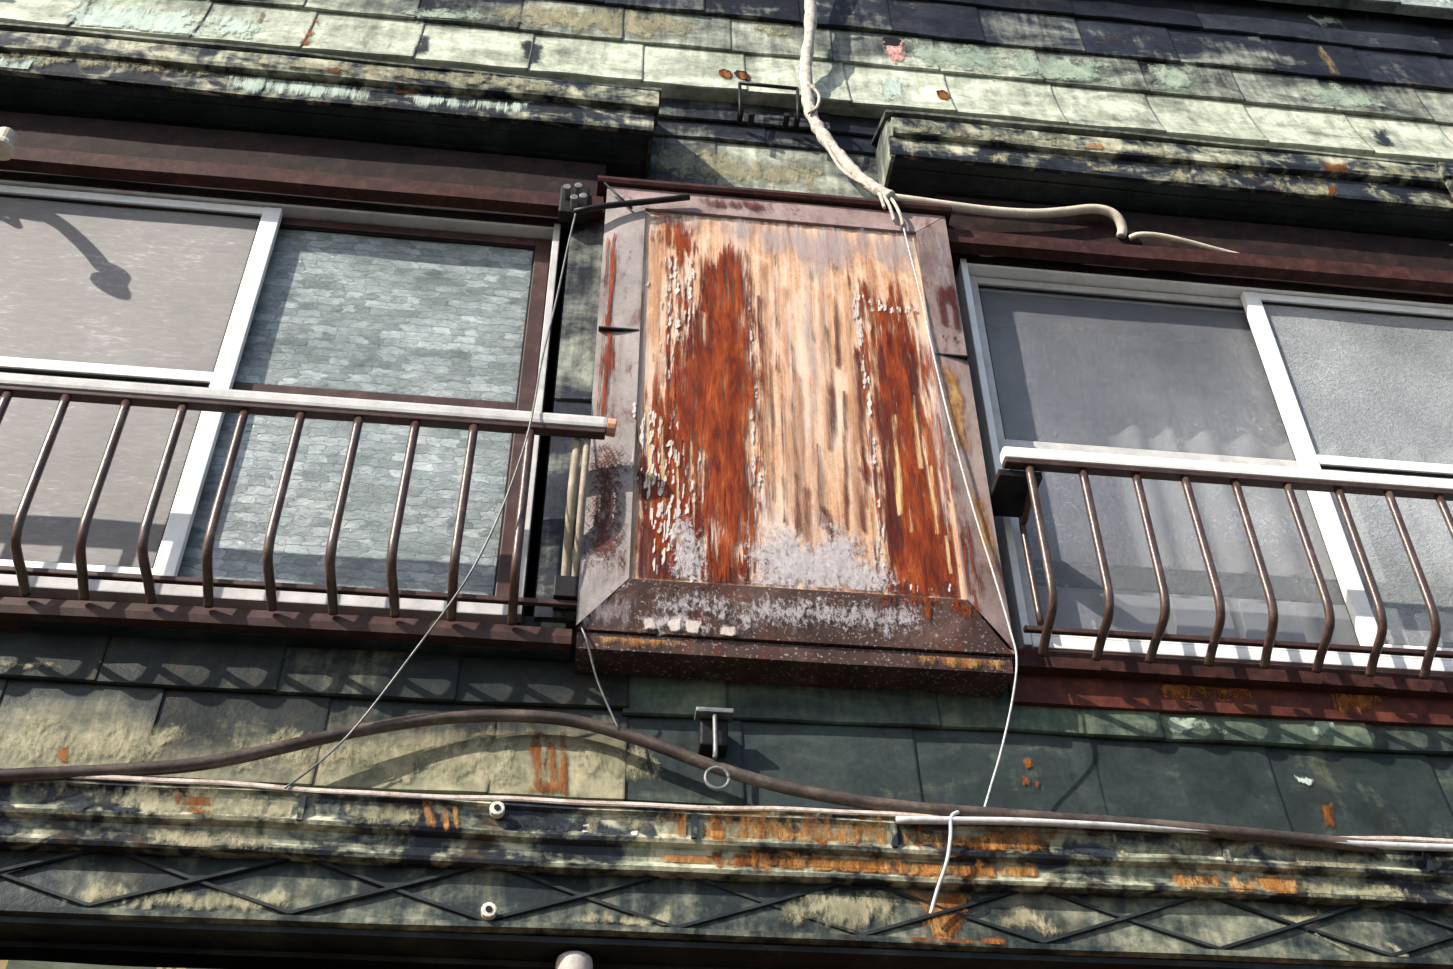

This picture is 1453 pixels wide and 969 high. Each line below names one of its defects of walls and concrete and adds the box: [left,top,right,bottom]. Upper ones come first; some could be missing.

damp [67,0,267,38]
damp [183,57,570,113]
corrosion [582,214,996,619]
peeling [630,256,951,637]
corrosion [921,656,1000,670]
corrosion [527,731,568,796]
damp [41,785,293,847]
damp [82,882,288,910]
damp [782,891,893,929]
corrosion [664,807,1057,944]
corrosion [1174,873,1296,894]
damp [1285,851,1403,950]